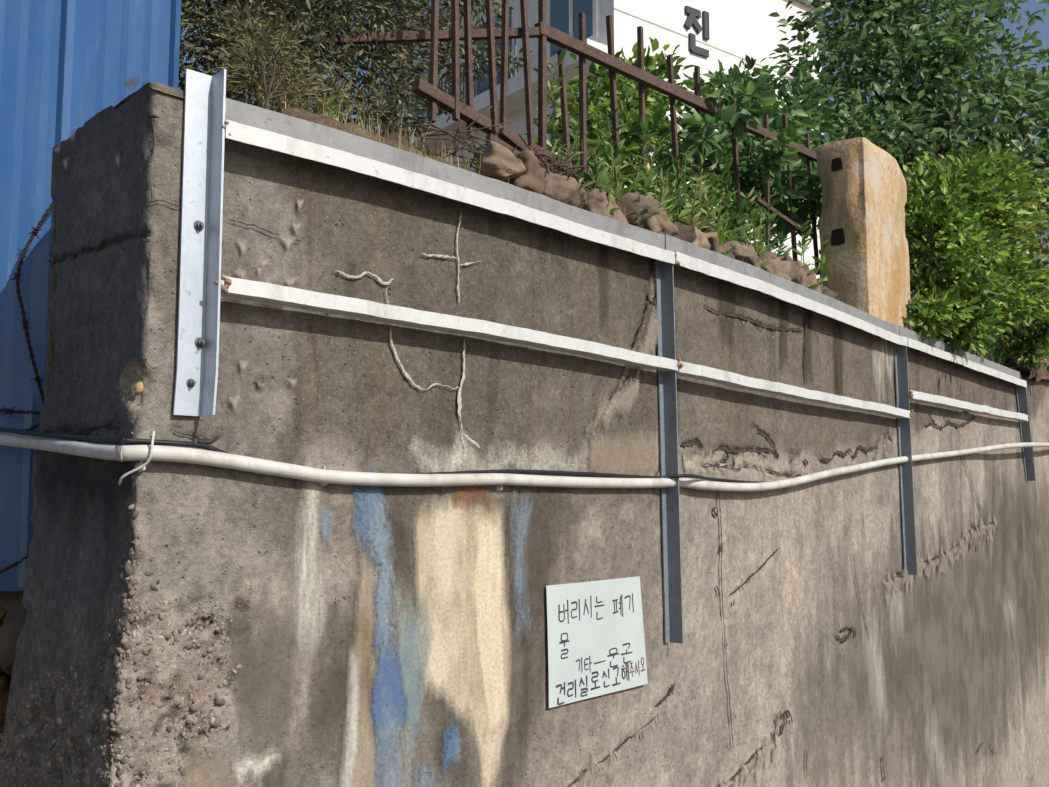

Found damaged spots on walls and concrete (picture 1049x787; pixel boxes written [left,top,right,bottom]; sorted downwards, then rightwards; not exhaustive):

crack [334,271,480,449]
crack [422,209,481,303]
spalling [593,365,639,432]
crack [589,259,657,437]
spalling [640,314,659,354]
spalling [128,504,143,523]
spalling [73,541,266,787]
leakage [509,514,550,743]
crack [568,683,676,787]
crack [656,424,894,787]
crack [836,411,995,657]
leakage [892,470,1049,787]